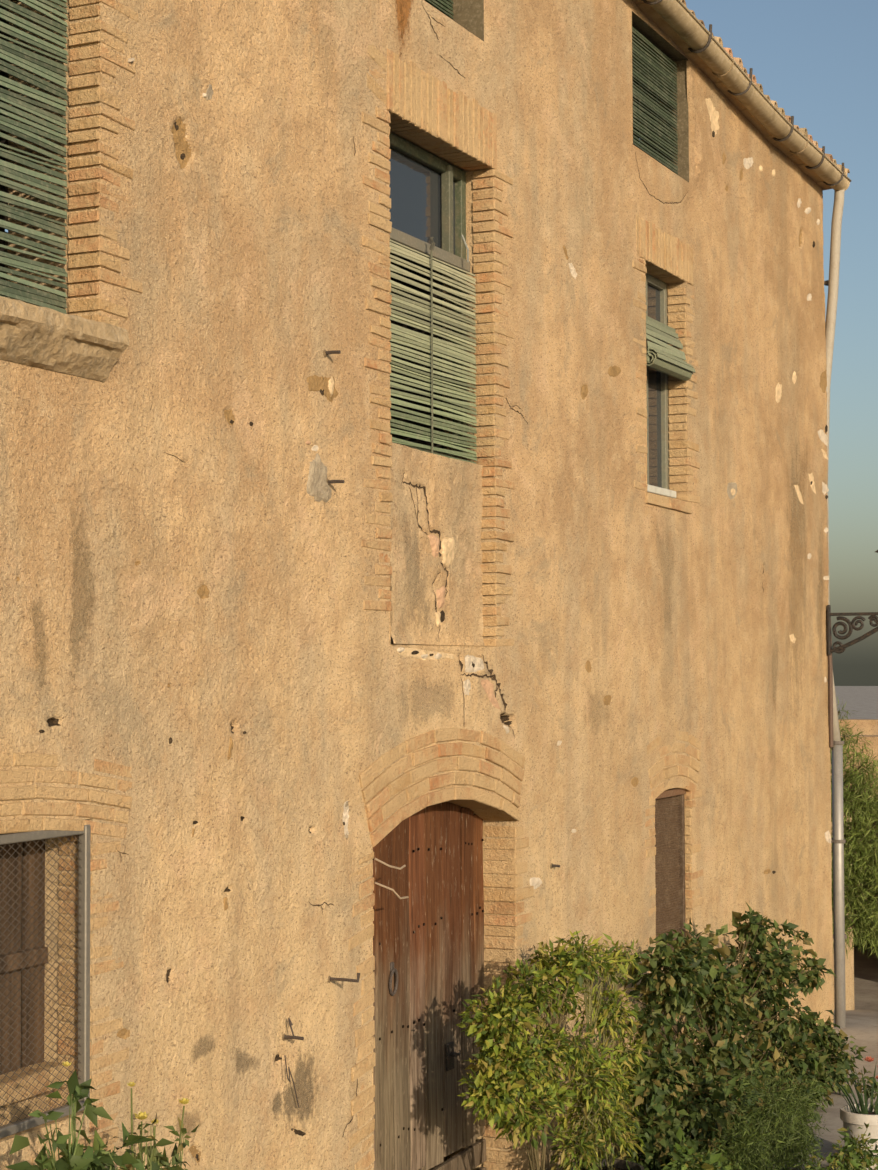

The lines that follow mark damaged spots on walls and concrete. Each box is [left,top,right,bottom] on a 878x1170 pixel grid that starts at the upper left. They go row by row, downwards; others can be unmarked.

rust [396,0,413,45]
spalling [171,117,192,169]
spalling [705,98,719,137]
crack [402,474,448,637]
crack [459,656,515,737]
spalling [39,717,61,733]
water stain [273,1059,314,1120]
spalling [189,1145,201,1165]